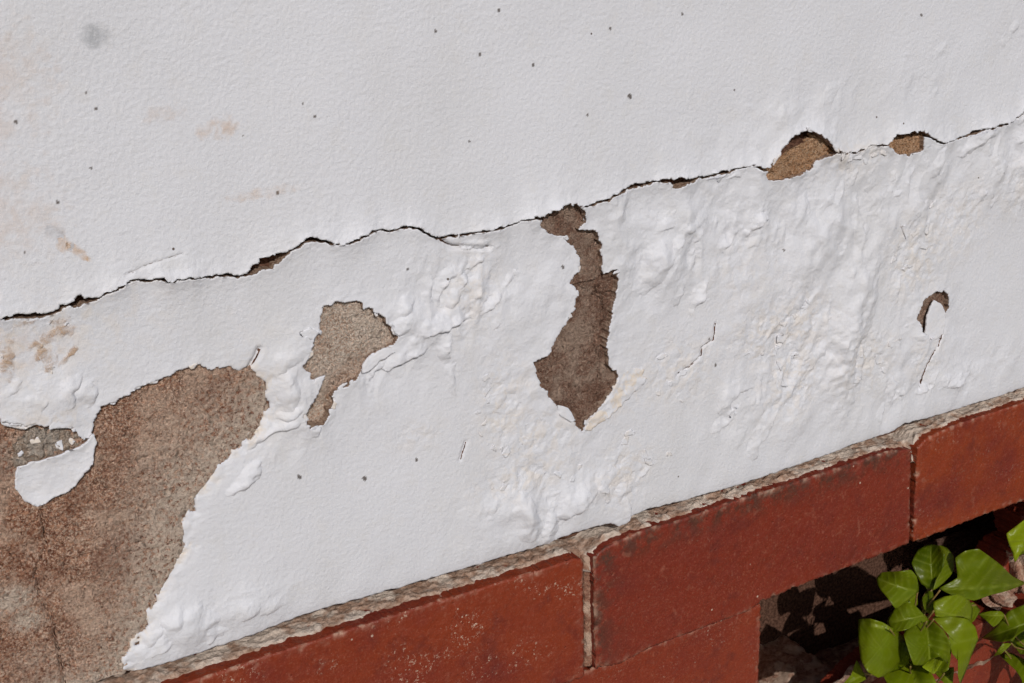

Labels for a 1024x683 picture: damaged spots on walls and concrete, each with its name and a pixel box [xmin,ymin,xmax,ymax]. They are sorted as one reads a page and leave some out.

crack [781,131,809,155]
peeling [756,127,925,180]
crack [661,176,685,184]
crack [412,226,459,246]
crack [231,253,279,275]
peeling [534,205,647,431]
peeling [917,291,946,339]
peeling [300,301,395,422]
peeling [0,363,268,683]